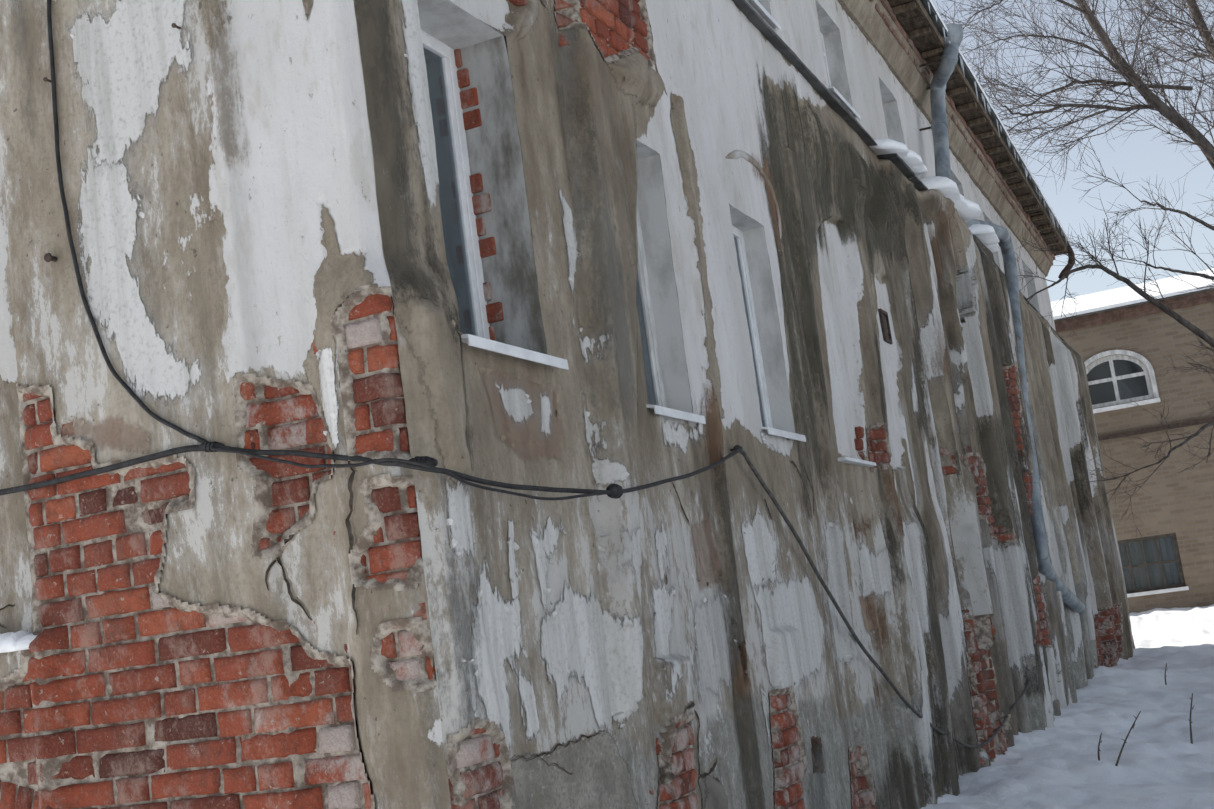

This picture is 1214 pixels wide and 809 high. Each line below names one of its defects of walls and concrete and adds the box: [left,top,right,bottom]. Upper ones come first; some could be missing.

peeling [67,0,201,404]
flaking render [0,383,375,809]
crack [265,525,312,621]
flaking render [233,204,437,693]
crack [345,439,360,635]
crack [510,730,605,775]
peeling [444,481,748,809]
water stain [725,69,933,518]
water stain [874,495,979,809]
peeling [902,221,1060,776]
water stain [973,235,1051,701]
water stain [1070,396,1093,515]